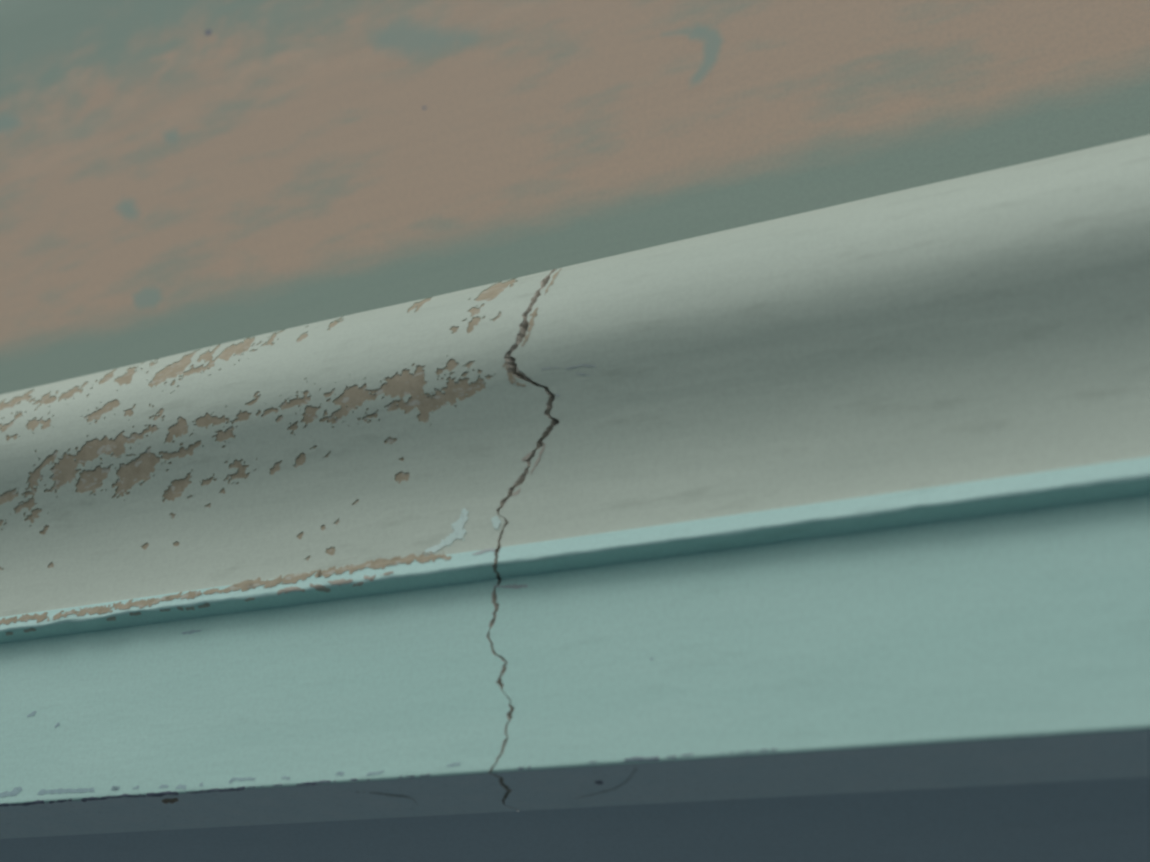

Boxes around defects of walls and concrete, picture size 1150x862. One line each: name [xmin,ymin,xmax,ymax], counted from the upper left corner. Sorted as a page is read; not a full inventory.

spalling [450,279,517,333]
peeling [0,330,284,441]
peeling [0,359,493,535]
peeling [0,547,451,636]
crack [472,268,562,811]